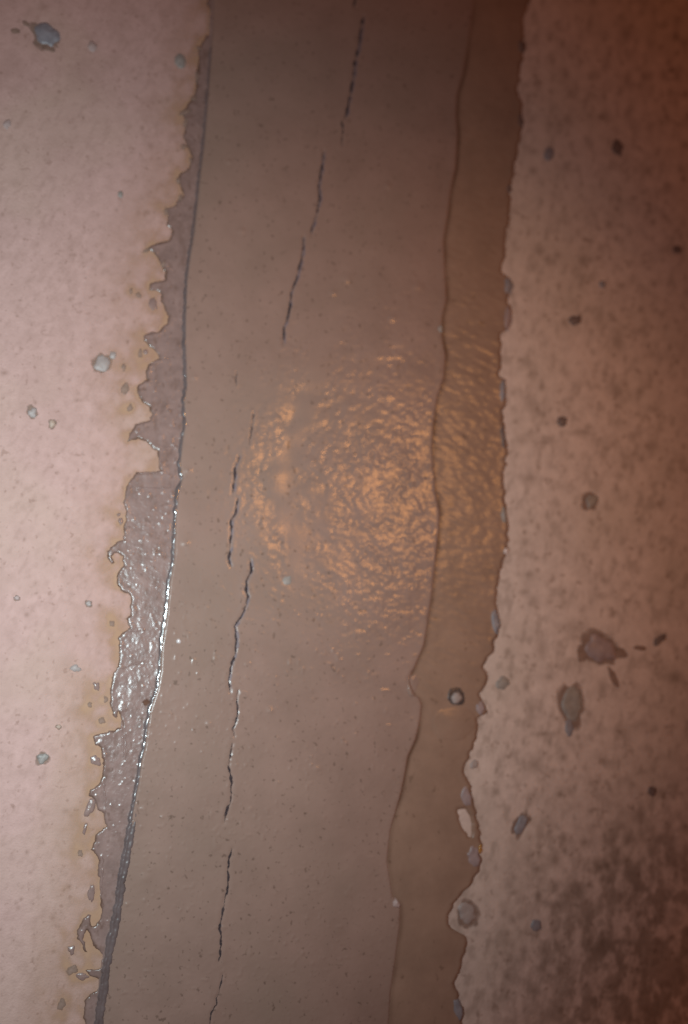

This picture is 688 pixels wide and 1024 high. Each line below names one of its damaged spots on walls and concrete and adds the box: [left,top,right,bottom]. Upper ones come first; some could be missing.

crack [283,0,365,343]
peeling [67,0,214,1024]
crack [224,414,254,821]
damp [62,676,123,983]
crack [210,849,232,1021]
spalling [457,900,479,928]
peeling [458,786,481,867]
spalling [512,814,531,838]